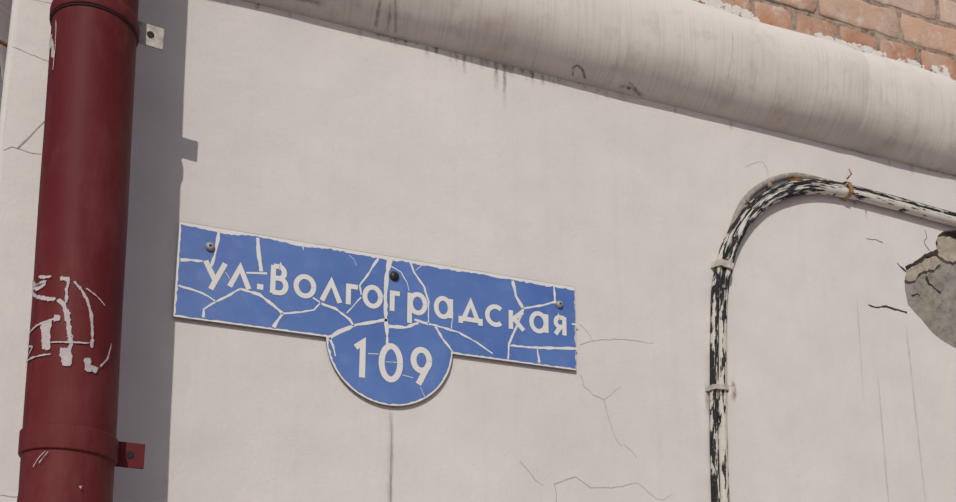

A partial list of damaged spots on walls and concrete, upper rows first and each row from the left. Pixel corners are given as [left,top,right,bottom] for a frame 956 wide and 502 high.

peeling [696,0,760,22]
peeling [814,32,952,79]
crack [5,122,44,154]
flaking render [868,231,956,348]
crack [519,460,670,502]